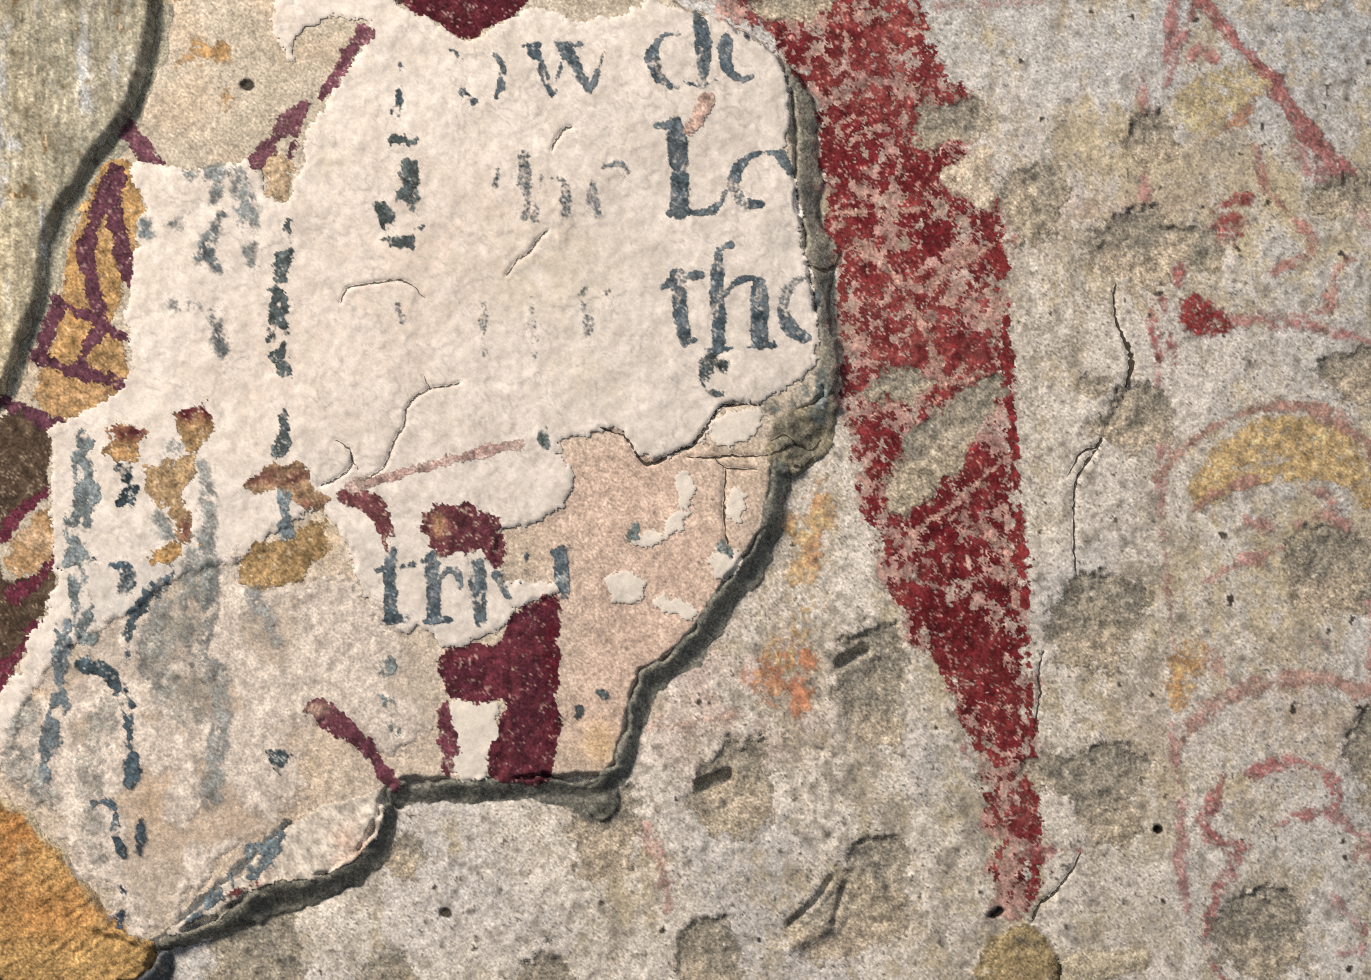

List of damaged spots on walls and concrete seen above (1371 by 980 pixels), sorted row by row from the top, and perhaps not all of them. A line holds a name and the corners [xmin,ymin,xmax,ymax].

crack [1068,283,1135,576]
spalling [234,460,395,591]
spalling [420,501,507,569]
peeling [603,570,699,621]
peeling [706,546,743,581]
spalling [829,618,911,753]
peeling [450,693,500,783]
spalling [562,782,646,884]
spalling [684,733,775,843]
spalling [205,891,308,980]
spalling [670,909,745,980]
spalling [781,829,919,968]